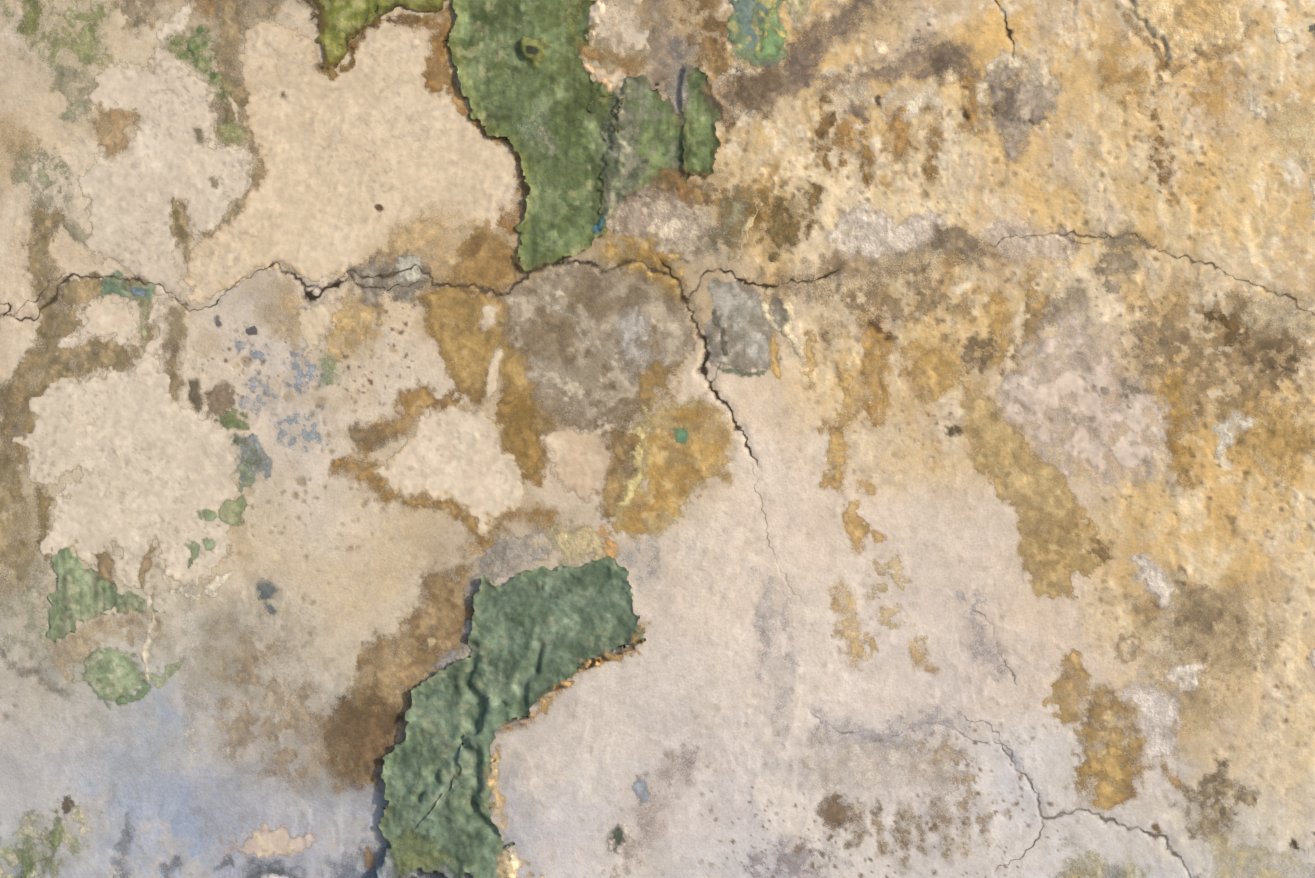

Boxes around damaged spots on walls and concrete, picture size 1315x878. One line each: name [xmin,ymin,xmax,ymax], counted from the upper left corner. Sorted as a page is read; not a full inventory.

peeling [11,0,652,589]
crack [0,200,836,595]
crack [990,230,1315,315]
peeling [376,556,646,878]
crack [976,611,1016,681]
crack [811,712,1192,878]